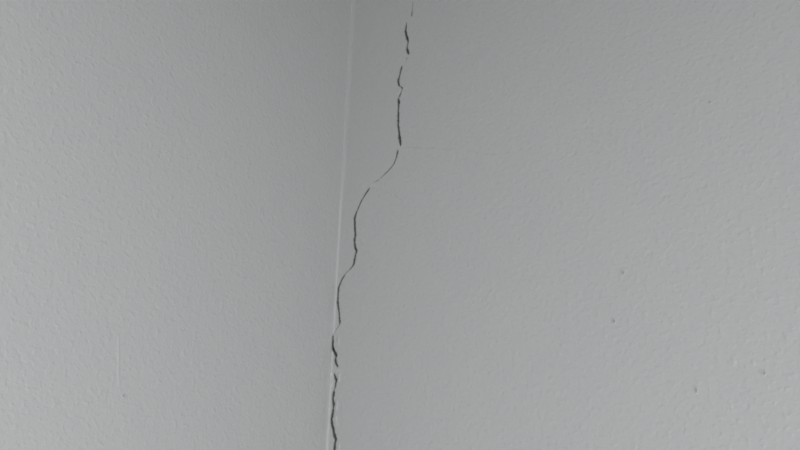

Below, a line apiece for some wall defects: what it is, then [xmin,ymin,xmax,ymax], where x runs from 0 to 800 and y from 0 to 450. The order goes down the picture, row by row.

crack [328,1,413,450]